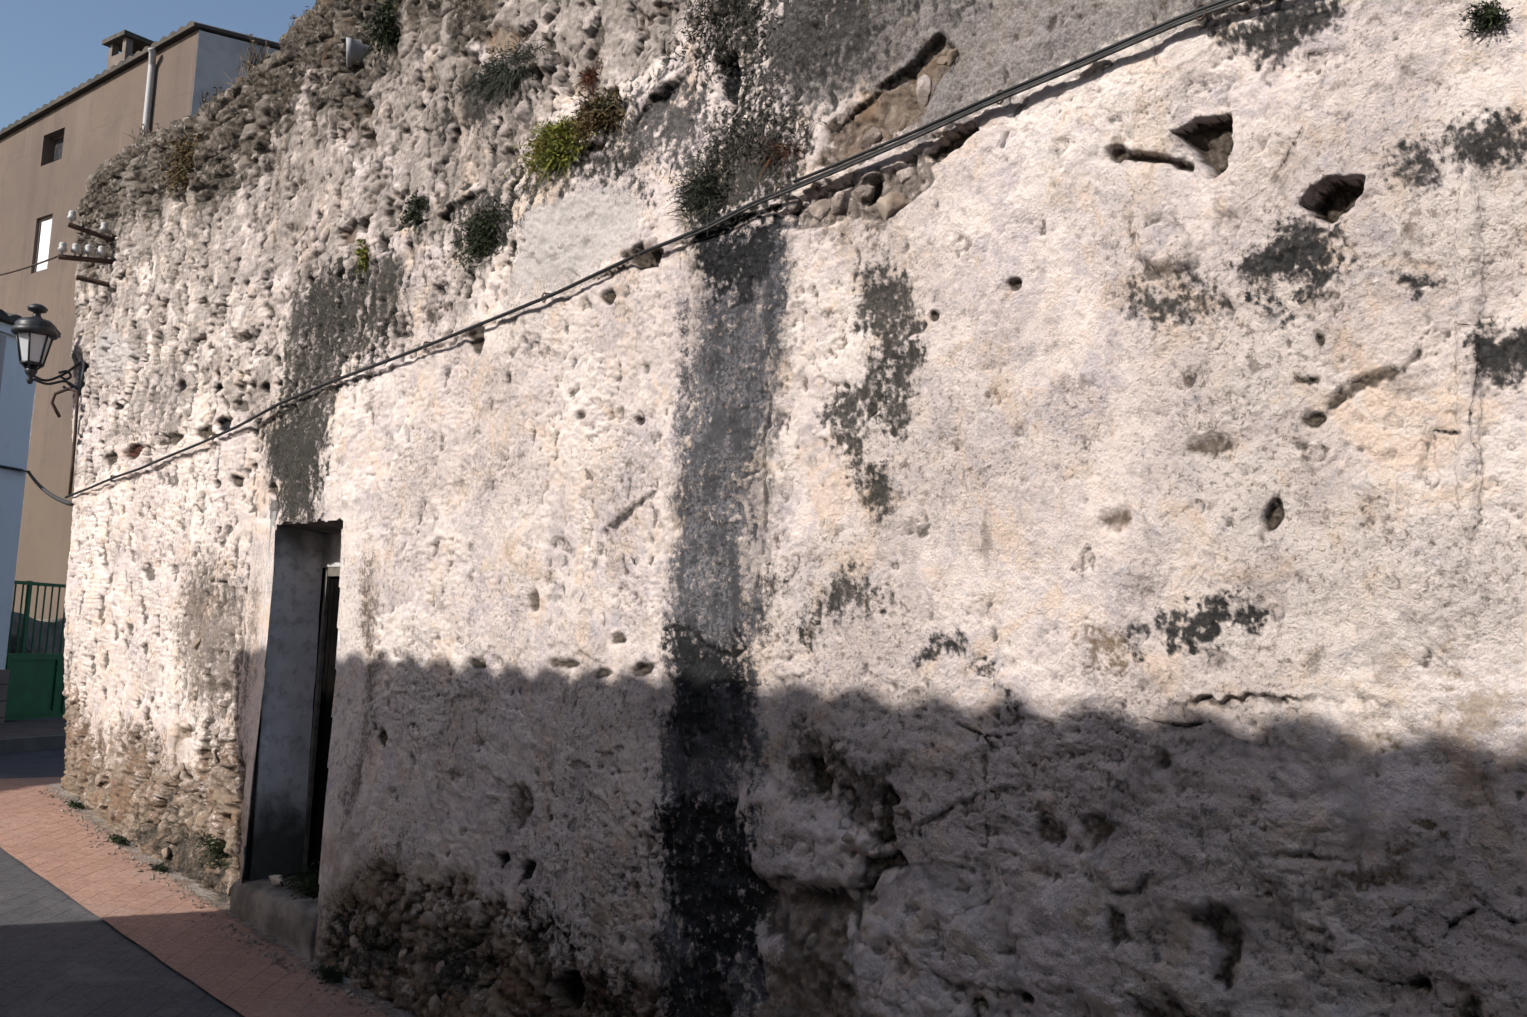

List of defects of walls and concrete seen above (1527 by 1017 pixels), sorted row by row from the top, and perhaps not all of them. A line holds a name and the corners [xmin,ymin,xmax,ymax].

flaking render [787,37,960,234]
damp [254,228,411,526]
damp [815,251,927,523]
damp [1245,288,1295,330]
damp [650,0,894,1017]
flaking render [60,545,248,905]
flaking render [777,713,910,871]
flaking render [316,842,667,1017]
flaking render [746,882,865,1017]